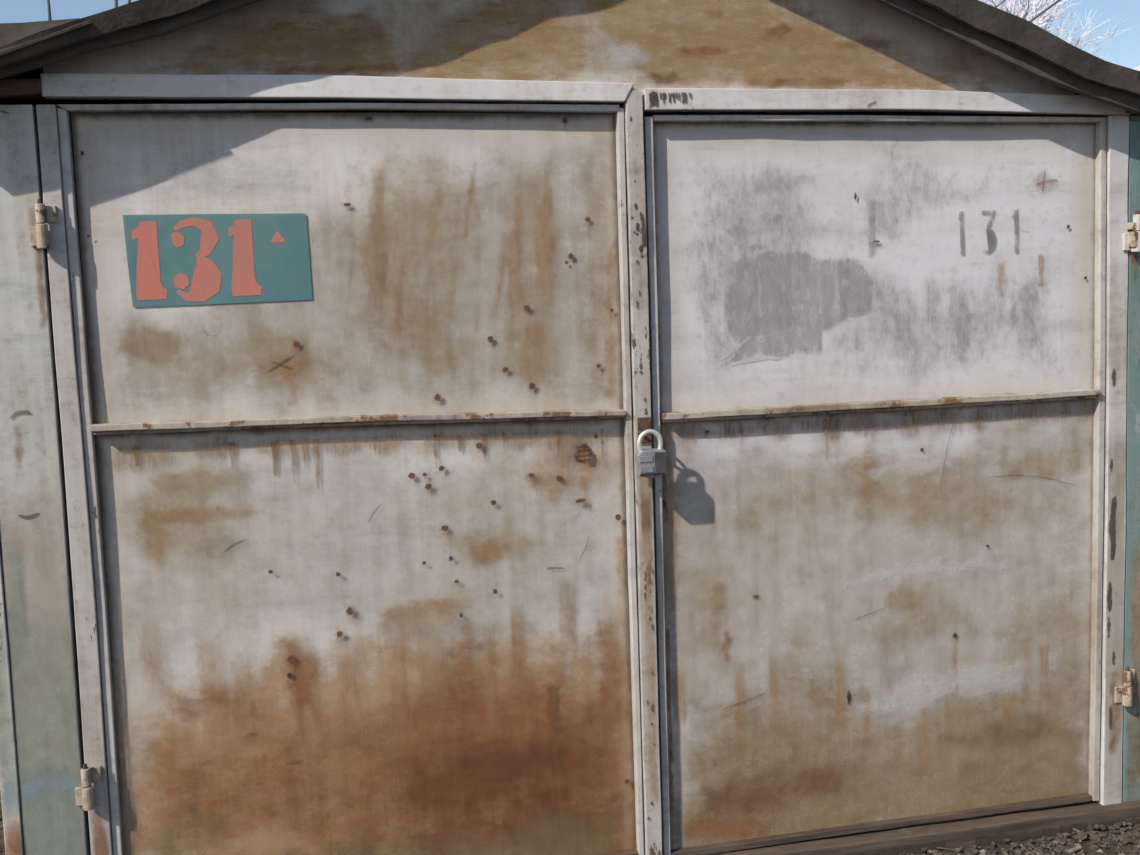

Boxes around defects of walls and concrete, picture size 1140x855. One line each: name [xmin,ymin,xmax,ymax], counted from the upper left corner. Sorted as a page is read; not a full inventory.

rust [179,0,583,81]
rust [585,0,959,91]
peeling [722,217,881,366]
rust [261,441,356,477]
rust [641,483,651,599]
peeling [1109,496,1117,560]
rust [130,619,631,855]